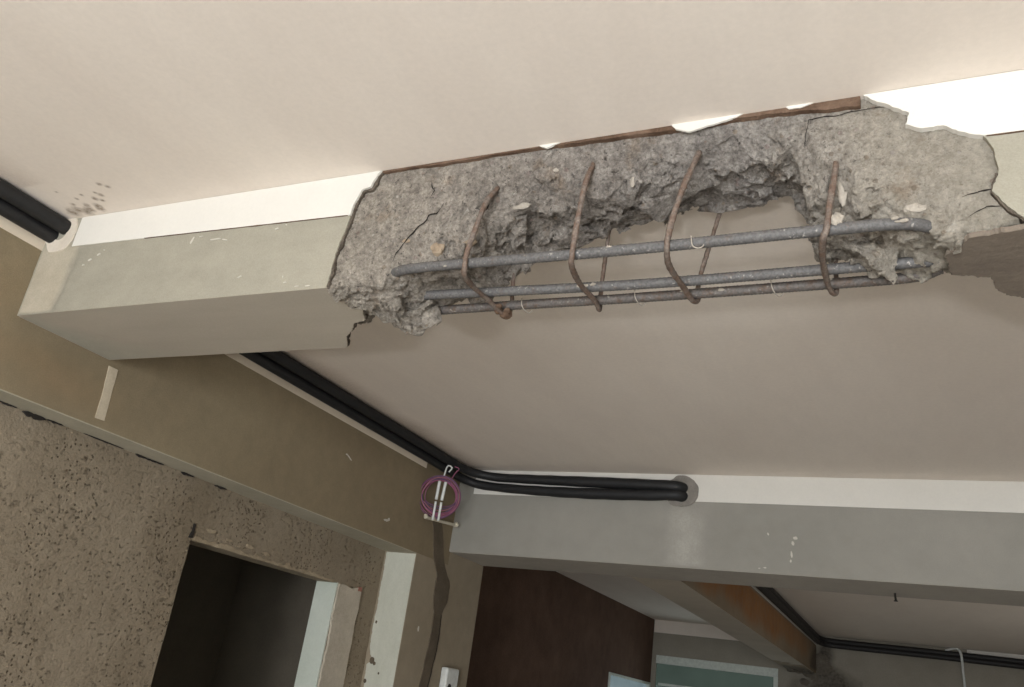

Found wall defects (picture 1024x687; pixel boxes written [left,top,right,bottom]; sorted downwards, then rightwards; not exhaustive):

water stain [62,181,113,218]
spalling [327,96,1024,346]
crack [963,189,998,216]